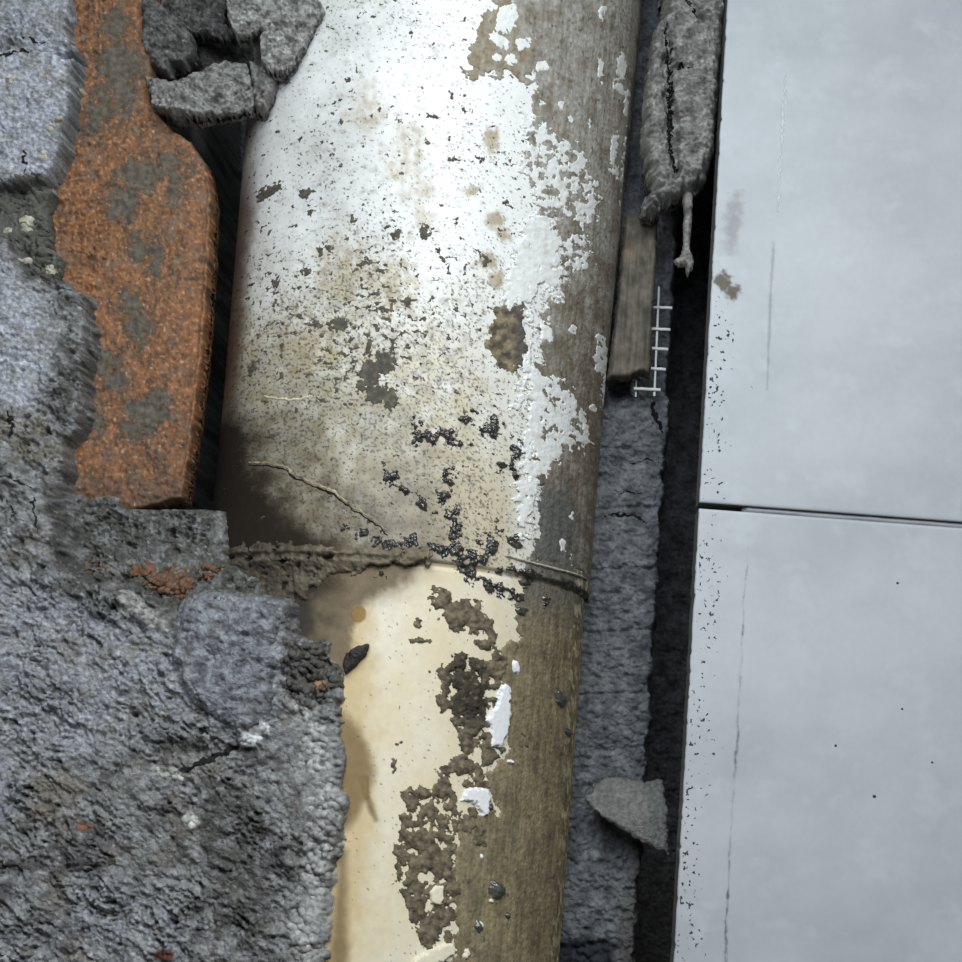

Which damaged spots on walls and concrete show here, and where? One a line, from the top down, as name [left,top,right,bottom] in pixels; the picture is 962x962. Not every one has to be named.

peeling [489,0,536,66]
peeling [532,60,550,72]
peeling [597,50,631,207]
peeling [484,108,608,541]
crack [264,394,311,402]
leakage [212,421,330,561]
crack [248,461,388,536]
peeling [485,684,512,749]
peeling [459,787,492,817]
peeling [429,885,444,906]
peeling [412,943,471,962]